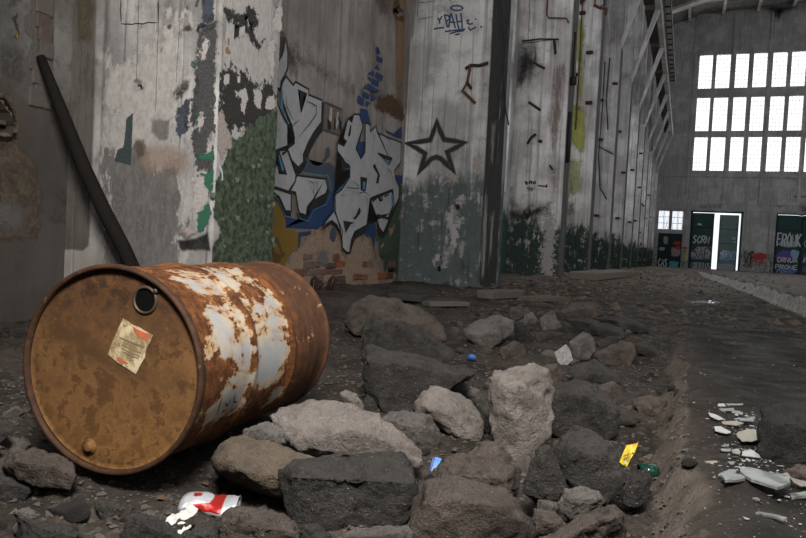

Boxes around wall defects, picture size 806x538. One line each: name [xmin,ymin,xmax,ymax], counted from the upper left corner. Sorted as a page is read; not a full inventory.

flaking render [21,0,55,112]
peeling [99,0,283,266]
flaking render [284,184,402,289]